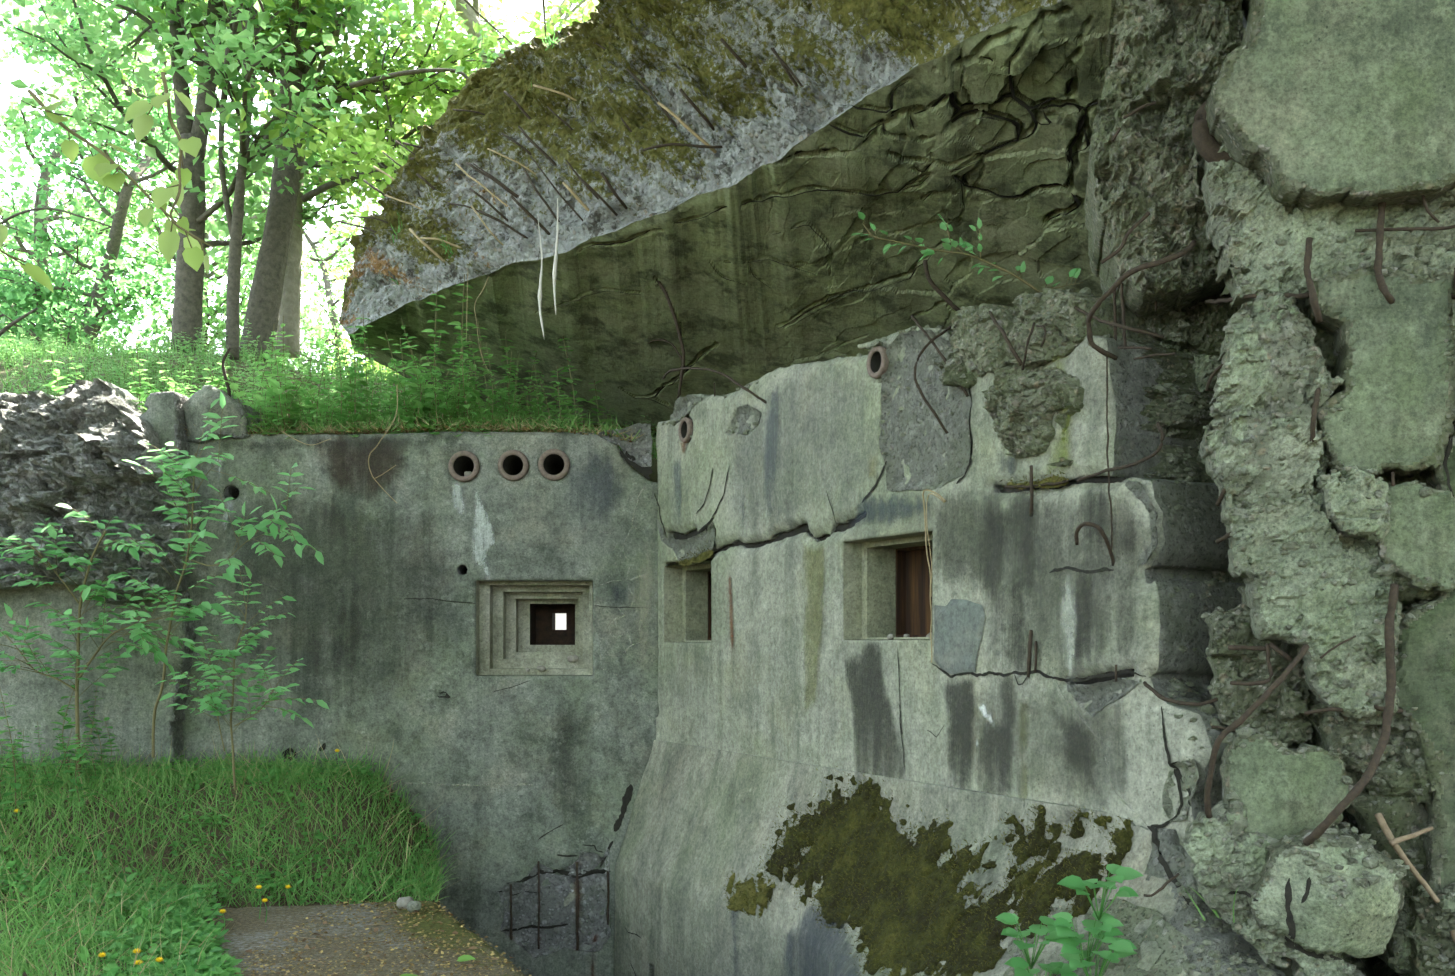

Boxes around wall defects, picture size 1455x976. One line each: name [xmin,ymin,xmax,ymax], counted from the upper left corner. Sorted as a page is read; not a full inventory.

crack [579,35,1098,329]
spalling [989,311,1047,370]
spalling [1004,240,1197,566]
crack [406,597,475,605]
crack [594,451,887,708]
peeling [1376,480,1455,593]
water stain [845,644,901,777]
water stain [945,678,1013,791]
crack [897,647,1191,905]
spalling [498,847,611,959]
water stain [786,908,858,976]